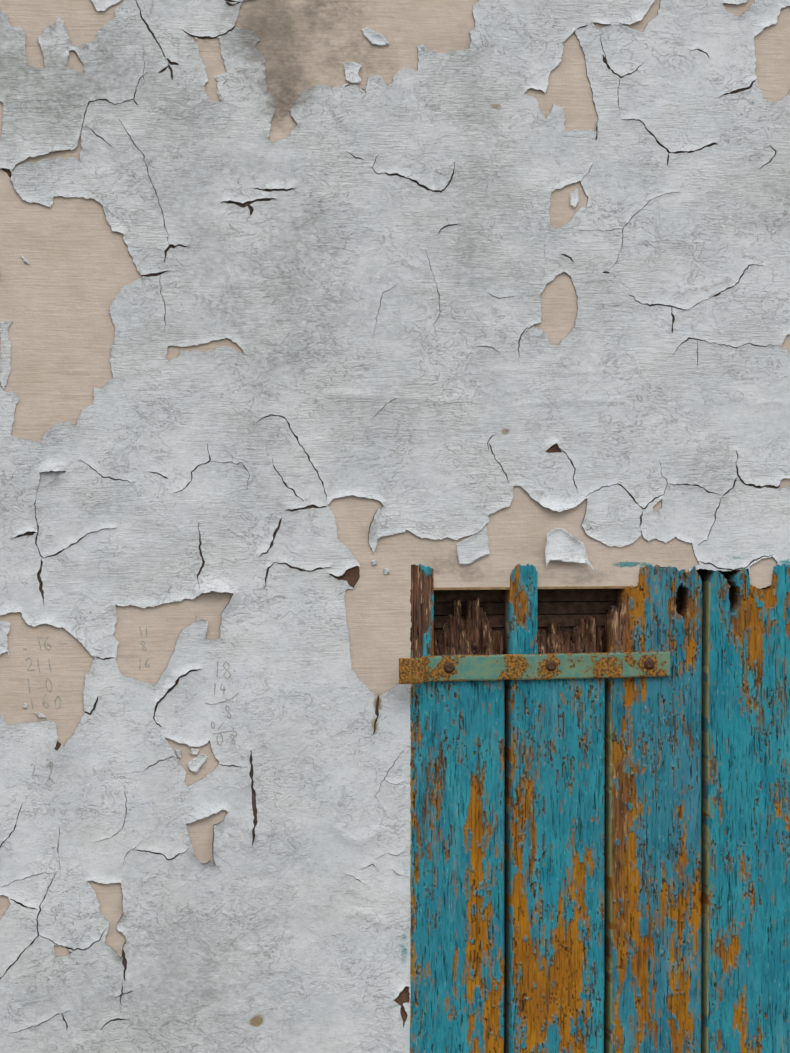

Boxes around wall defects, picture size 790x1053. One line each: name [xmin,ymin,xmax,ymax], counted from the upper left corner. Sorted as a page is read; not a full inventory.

peeling [233,0,480,144]
crack [350,153,454,193]
peeling [523,28,599,132]
crack [574,25,720,273]
peeling [0,96,142,442]
peeling [0,606,97,750]
crack [11,490,117,604]
peeling [111,576,241,688]
crack [256,414,335,589]
peeling [324,481,699,696]
crack [218,745,257,849]
crack [0,828,131,1032]